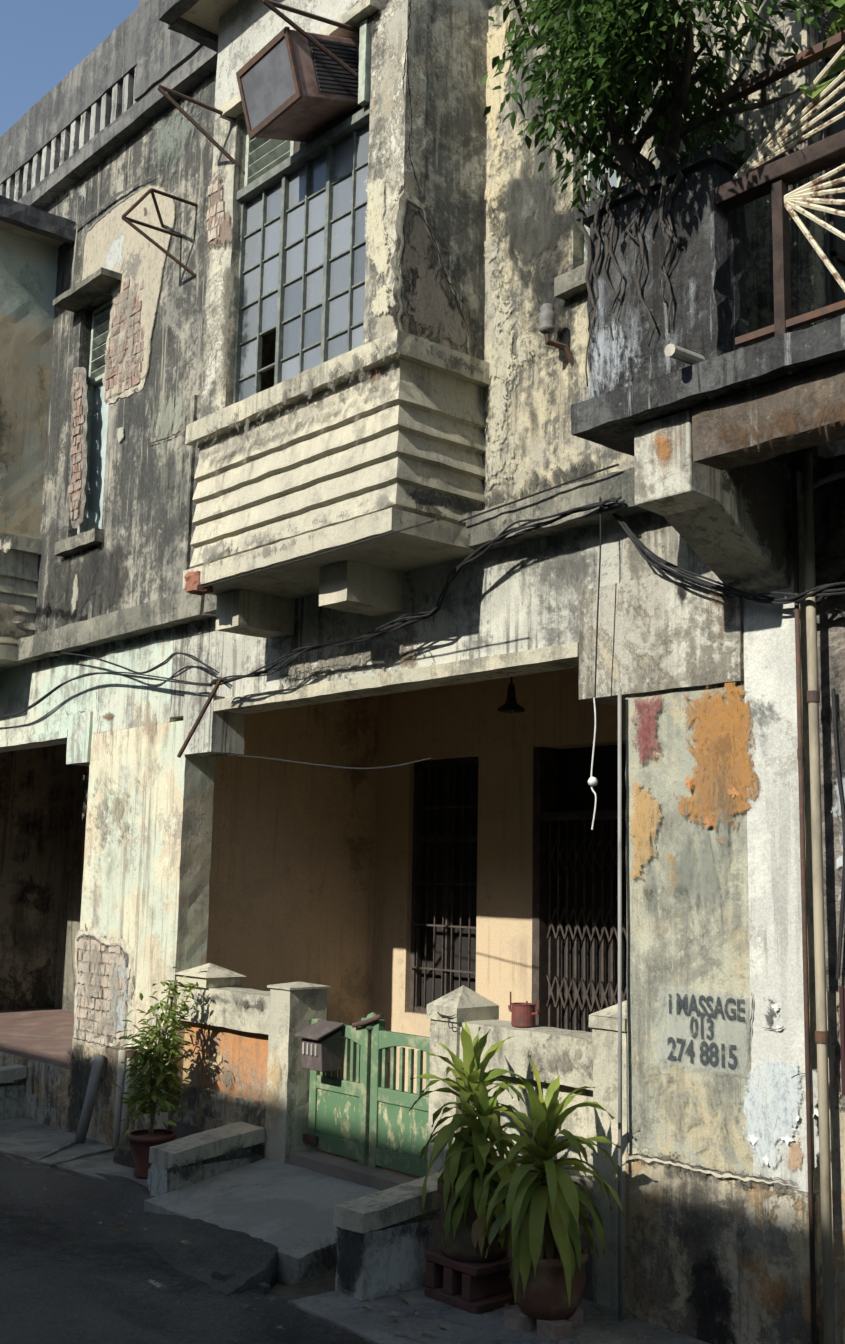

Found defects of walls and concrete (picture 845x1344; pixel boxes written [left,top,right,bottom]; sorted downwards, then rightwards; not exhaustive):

crack [402,1,473,354]
flaking render [364,21,534,497]
peeling [66,174,175,529]
leakage [83,700,166,867]
peeling [630,782,680,894]
peeling [673,681,761,844]
peeling [830,770,845,869]
leakage [0,928,58,1010]
flaking render [72,923,135,1050]
leakage [623,1213,737,1344]